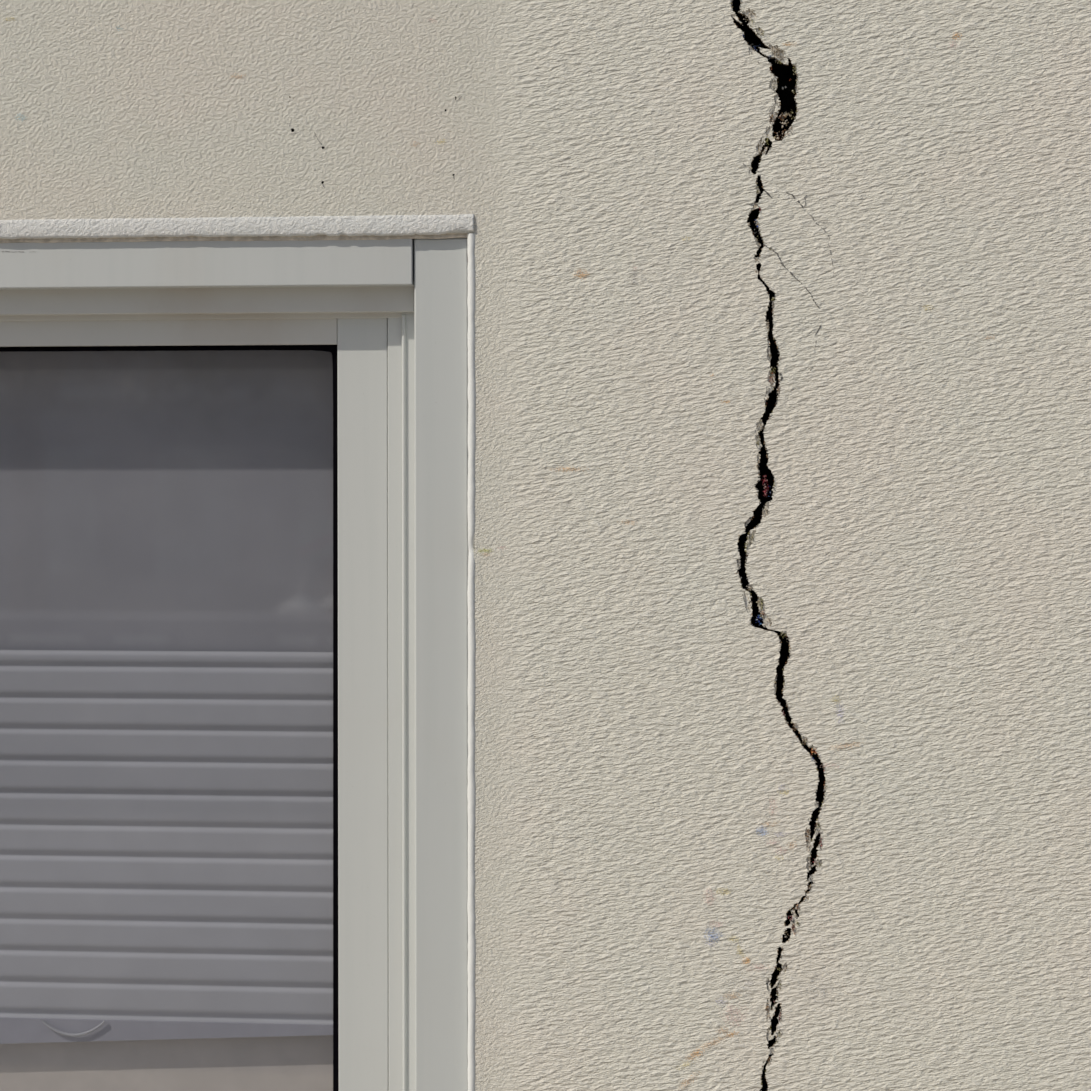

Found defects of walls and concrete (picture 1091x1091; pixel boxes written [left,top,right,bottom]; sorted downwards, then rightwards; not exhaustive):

crack [730,0,834,1091]